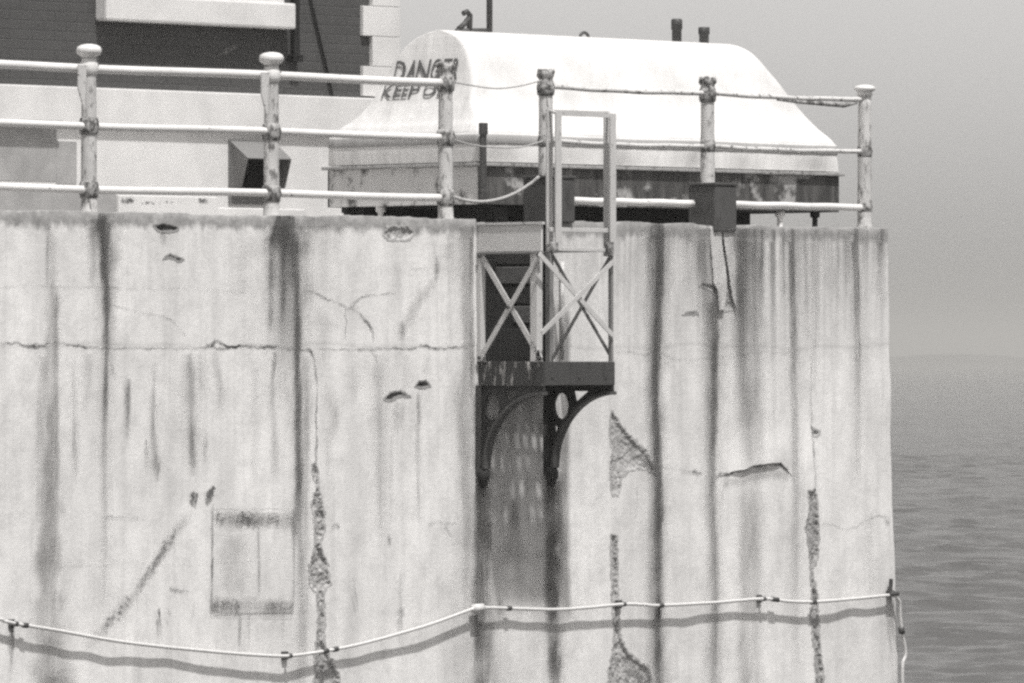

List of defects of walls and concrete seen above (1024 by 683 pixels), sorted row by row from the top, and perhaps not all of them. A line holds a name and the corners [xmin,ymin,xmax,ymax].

water stain [92,213,110,412]
spalling [153,221,179,233]
crack [211,341,274,349]
water stain [270,216,303,528]
spalling [383,379,431,402]
spalling [609,410,657,497]
water stain [650,223,664,683]
water stain [703,235,720,486]
water stain [737,229,775,356]
spalling [308,463,341,683]
spalling [607,533,653,683]
spalling [804,488,825,683]